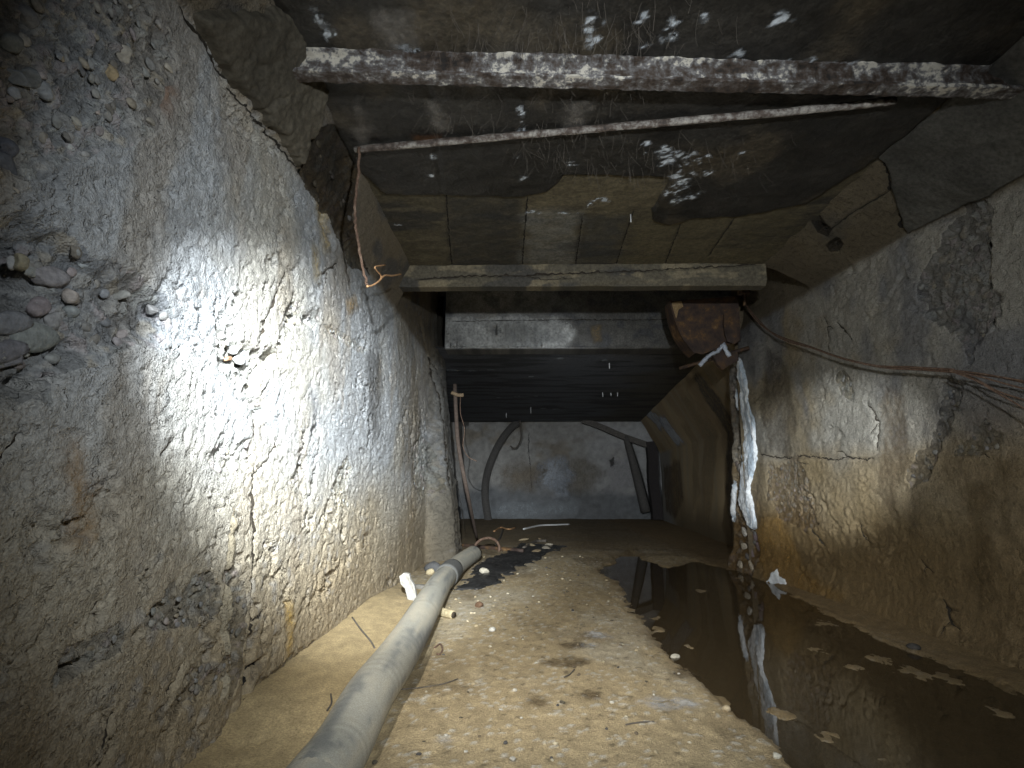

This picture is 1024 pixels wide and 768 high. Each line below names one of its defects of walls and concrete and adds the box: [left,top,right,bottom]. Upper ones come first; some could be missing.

water stain [661,146,708,203]
crack [259,272,285,344]
spalling [917,200,1002,366]
water stain [695,342,796,530]
crack [761,402,880,464]
crack [242,420,276,686]